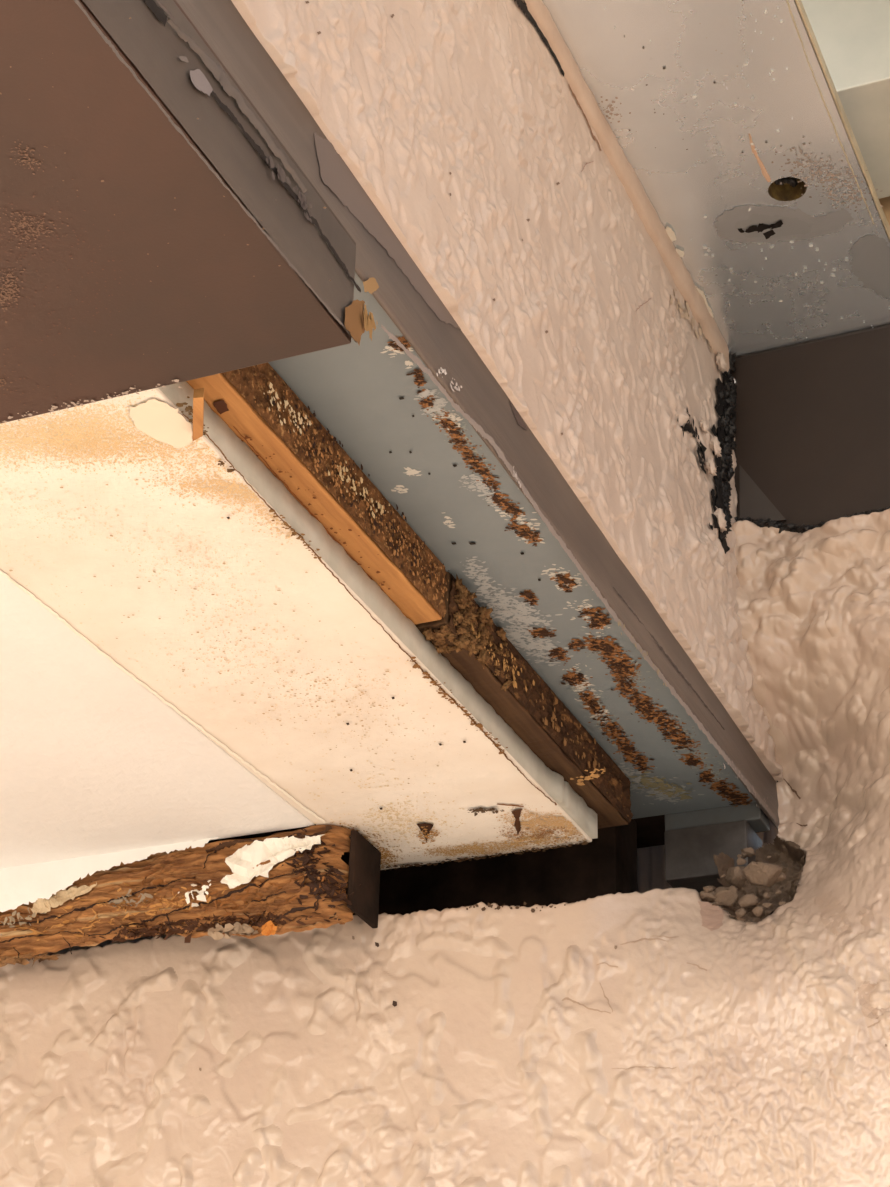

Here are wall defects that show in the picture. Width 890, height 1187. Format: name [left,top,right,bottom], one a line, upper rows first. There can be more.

leakage [713,136,882,243]
peeling [128,399,193,449]
corrosion [414,369,543,546]
leakage [0,388,586,870]
corrosion [527,607,753,806]
corrosion [414,823,441,844]
corrosion [468,804,524,834]
peeling [698,835,806,931]